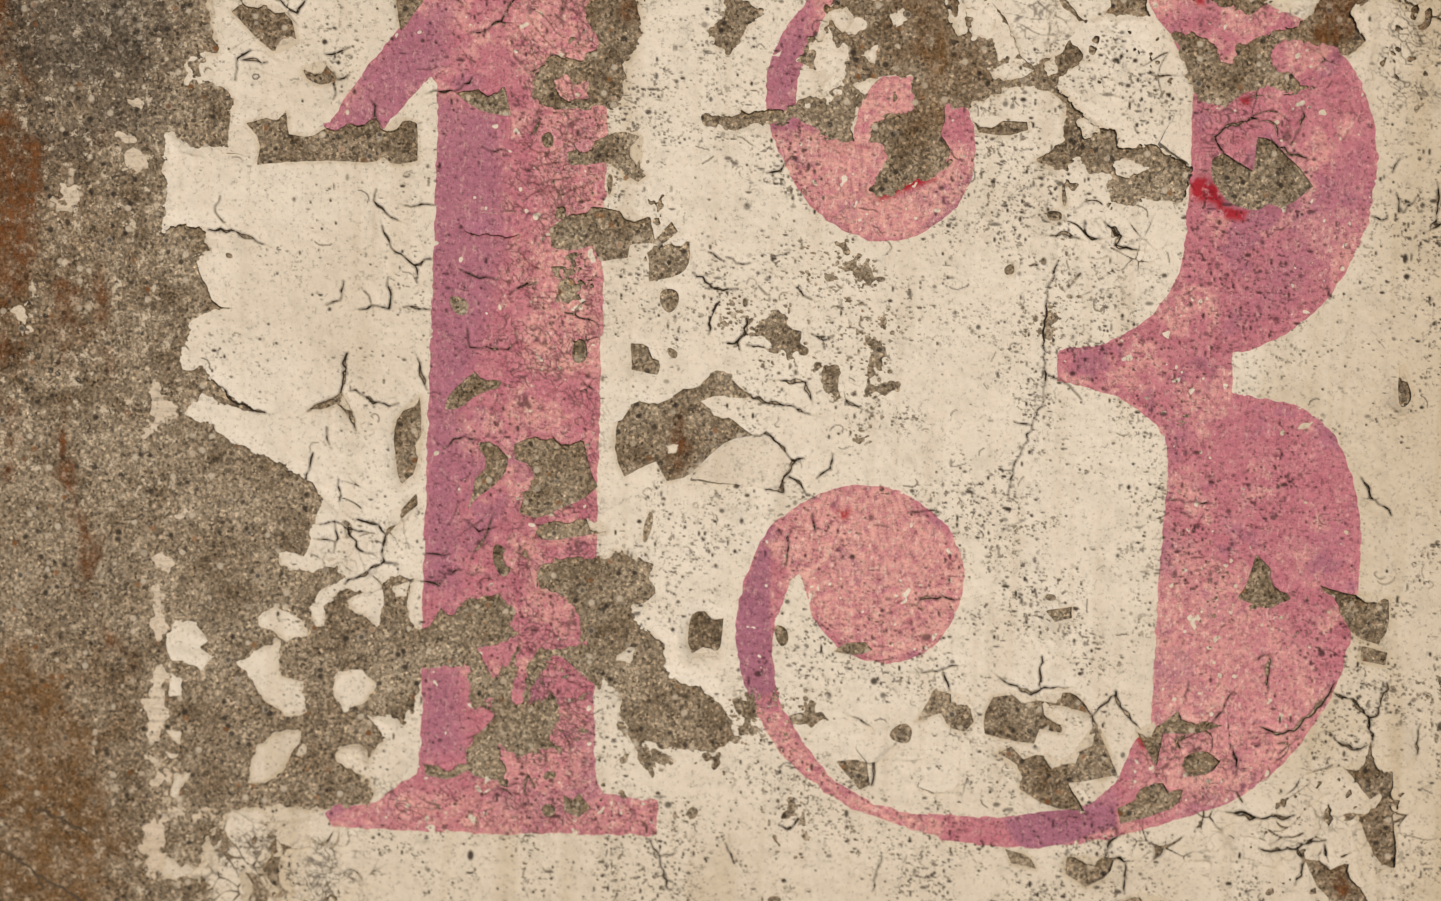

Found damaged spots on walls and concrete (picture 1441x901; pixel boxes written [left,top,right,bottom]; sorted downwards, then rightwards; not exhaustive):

peeling [232,0,300,54]
crack [280,0,305,14]
peeling [945,0,1111,81]
peeling [247,109,418,165]
peeling [542,132,690,312]
peeling [385,391,426,537]
peeling [611,368,758,481]
peeling [166,620,214,697]
peeling [236,605,308,784]
peeling [688,604,729,658]
peeling [890,687,1117,811]
peeling [1343,737,1396,868]